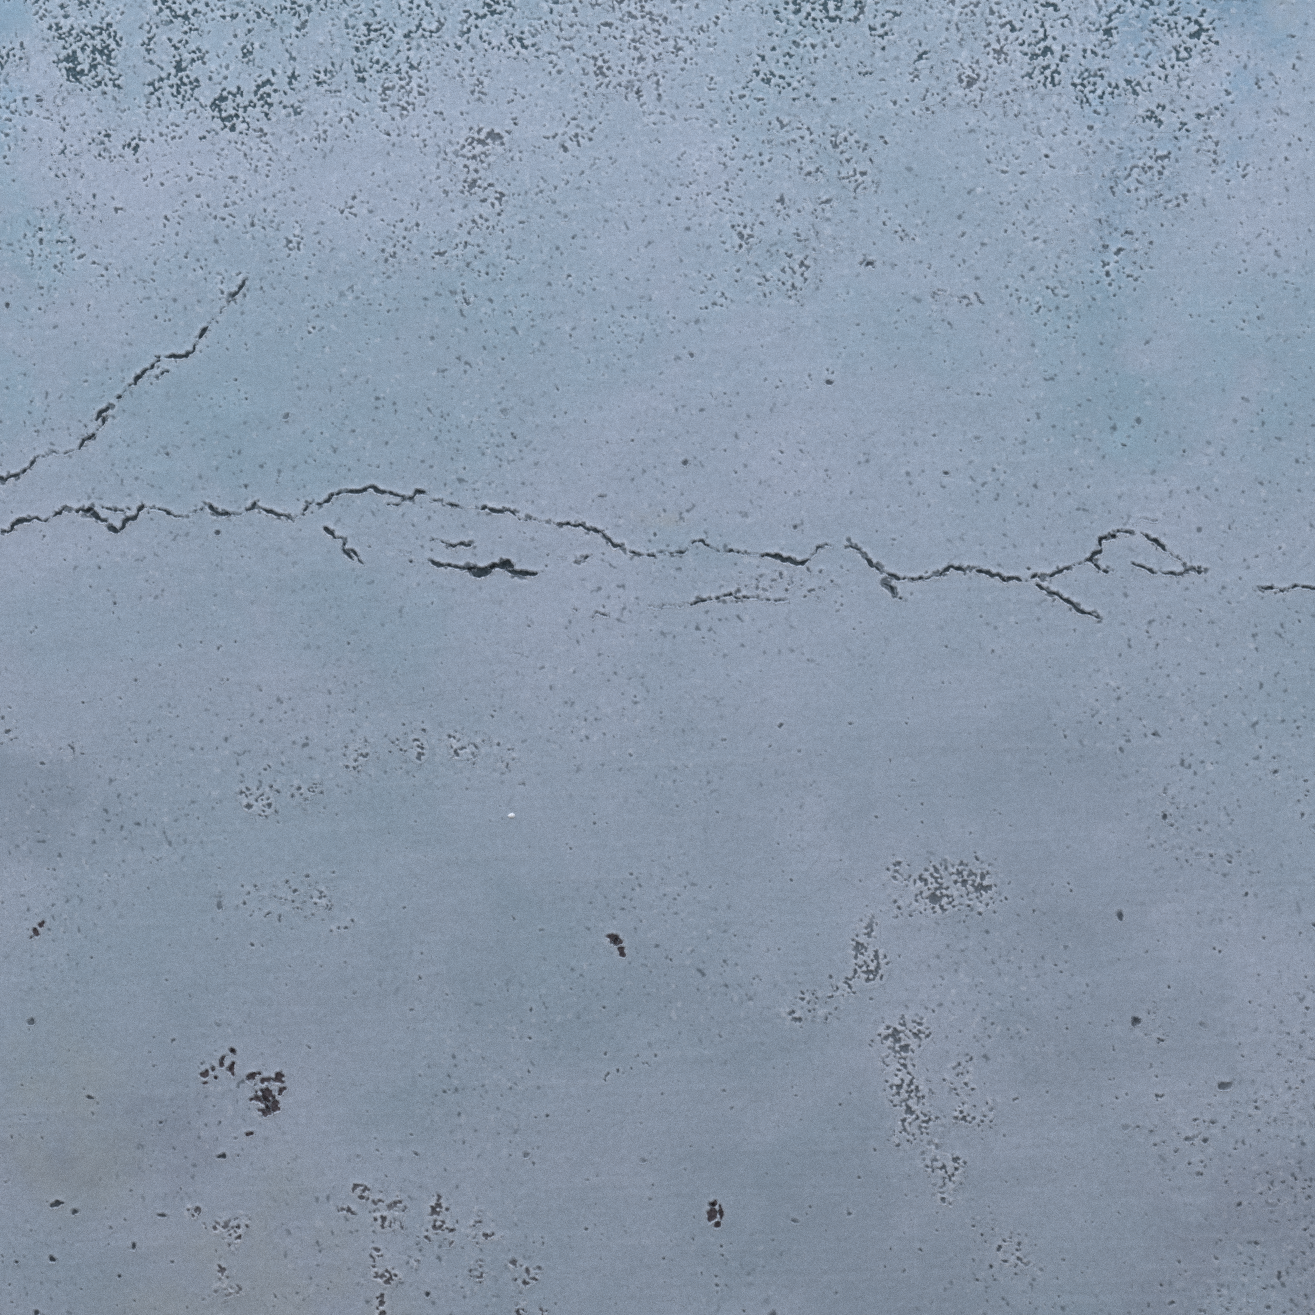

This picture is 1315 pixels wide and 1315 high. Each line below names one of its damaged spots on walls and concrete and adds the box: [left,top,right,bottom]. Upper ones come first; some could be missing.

crack [0,276,249,483]
crack [0,484,1205,621]
crack [1253,583,1315,594]